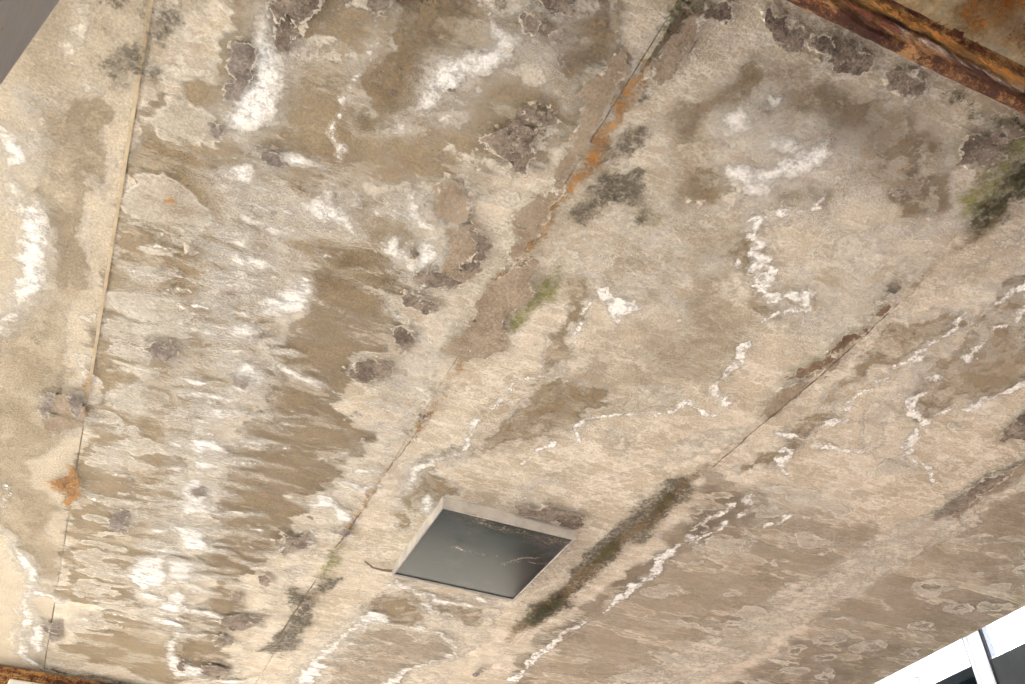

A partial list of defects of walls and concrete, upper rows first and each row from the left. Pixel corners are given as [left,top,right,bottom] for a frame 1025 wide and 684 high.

spalling [222,0,326,102]
spalling [760,0,929,100]
corrosion [864,0,1025,88]
leakage [0,126,60,334]
peeling [342,47,631,385]
leakage [676,84,975,336]
leakage [10,0,632,684]
crack [713,292,914,467]
corrosion [45,464,81,511]
crack [277,580,316,639]
crack [364,561,393,572]
leakage [507,271,1025,684]